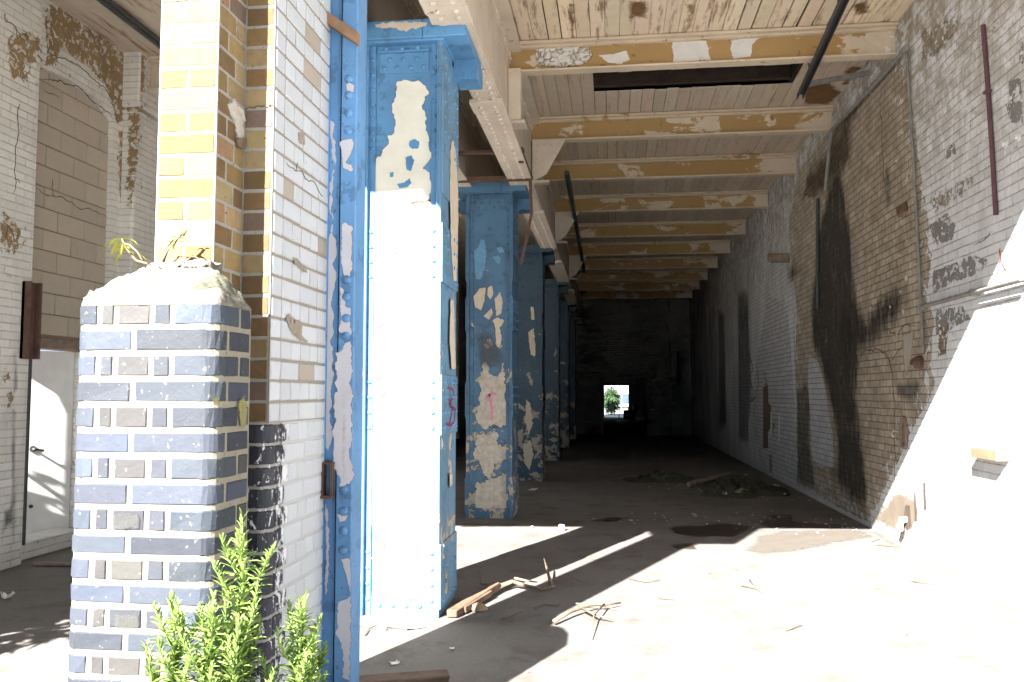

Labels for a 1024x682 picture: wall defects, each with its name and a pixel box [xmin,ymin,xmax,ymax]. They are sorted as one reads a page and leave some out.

peeling [0,212,21,254]
crack [14,106,106,217]
peeling [6,5,147,209]
peeling [326,120,355,487]
peeling [371,79,456,598]
peeling [474,285,505,347]
peeling [528,307,536,358]
damp [804,110,900,502]
peeling [789,31,987,521]
peeling [473,362,506,508]
peeling [523,400,534,471]
peeling [324,503,352,681]